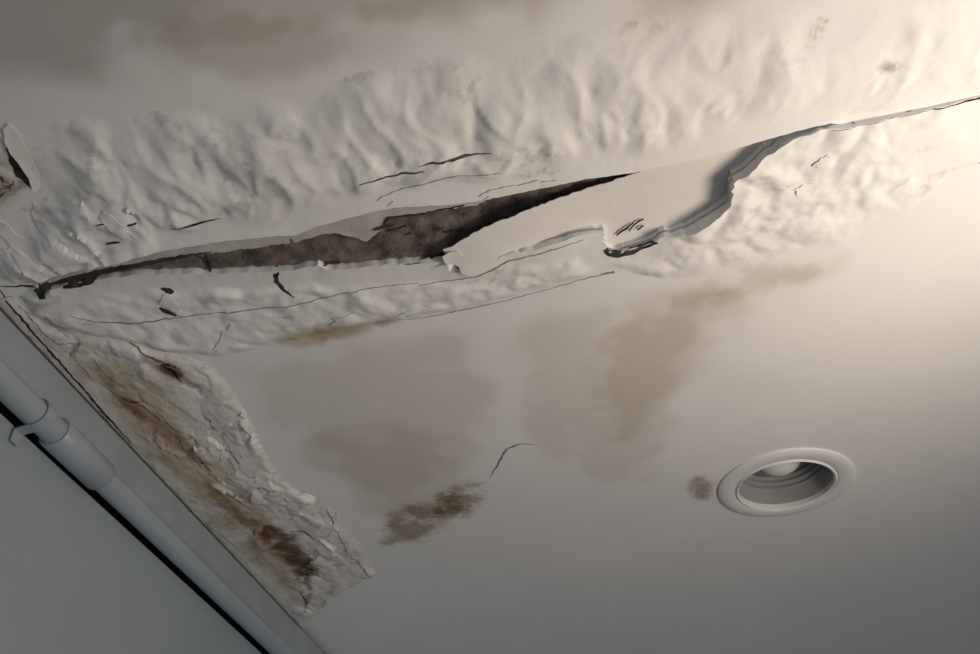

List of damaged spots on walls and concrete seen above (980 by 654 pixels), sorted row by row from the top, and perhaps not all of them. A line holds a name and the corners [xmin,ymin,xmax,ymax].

crack [833,97,980,131]
flaking render [116,172,637,271]
crack [616,218,644,236]
flaking render [38,272,89,293]
damp [264,526,317,581]